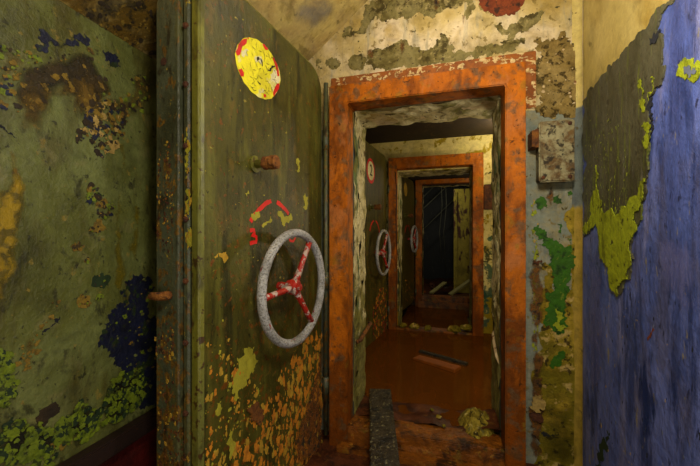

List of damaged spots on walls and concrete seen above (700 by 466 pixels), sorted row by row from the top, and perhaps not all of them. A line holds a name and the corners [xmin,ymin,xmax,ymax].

peeling [35,28,90,53]
water stain [0,45,151,122]
peeling [103,50,121,68]
peeling [676,57,700,83]
peeling [75,98,129,158]
peeling [316,0,675,466]
peeling [0,273,157,466]
peeling [205,330,323,466]